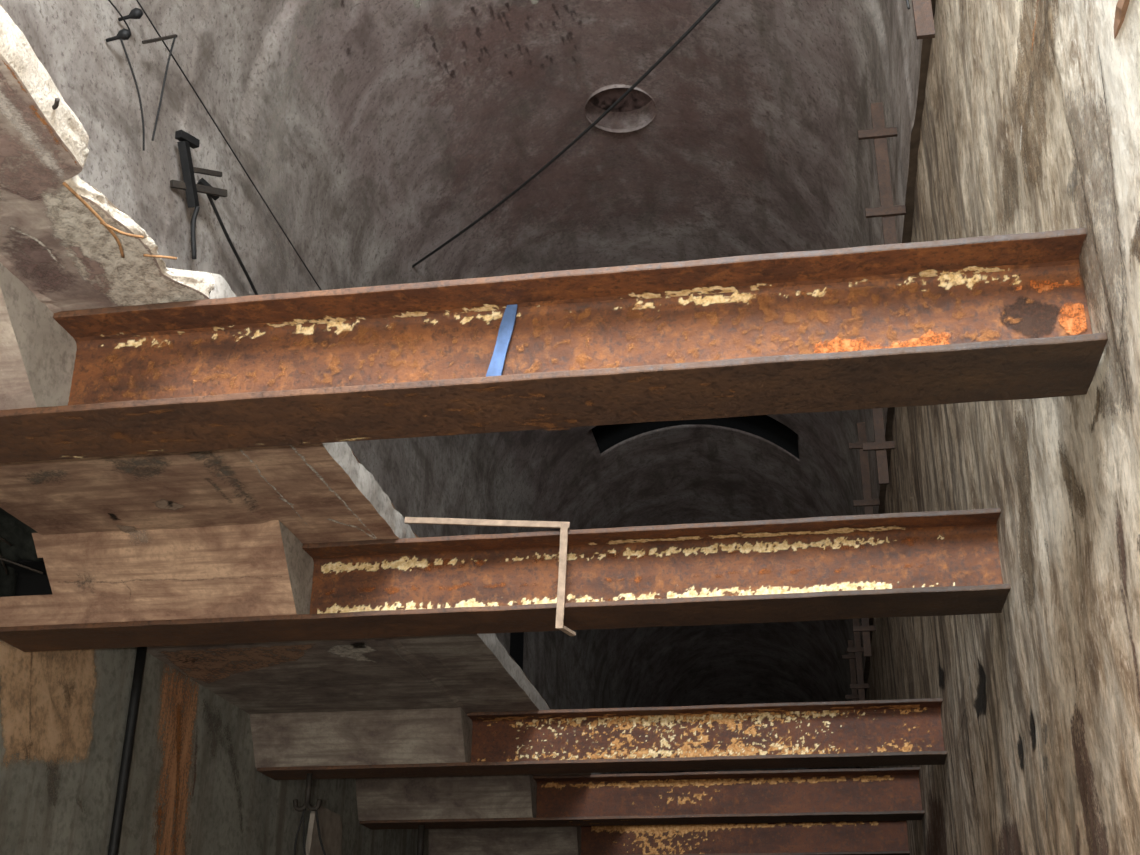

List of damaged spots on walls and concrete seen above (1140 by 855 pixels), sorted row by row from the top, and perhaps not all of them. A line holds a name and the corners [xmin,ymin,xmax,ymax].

spalling [1130,221,1140,276]
peeling [899,266,1021,291]
peeling [100,331,184,349]
peeling [212,316,365,341]
peeling [390,304,521,328]
peeling [629,284,826,311]
rust [814,330,951,353]
rust [1000,277,1087,338]
peeling [505,526,905,562]
peeling [321,556,486,574]
peeling [317,581,892,614]